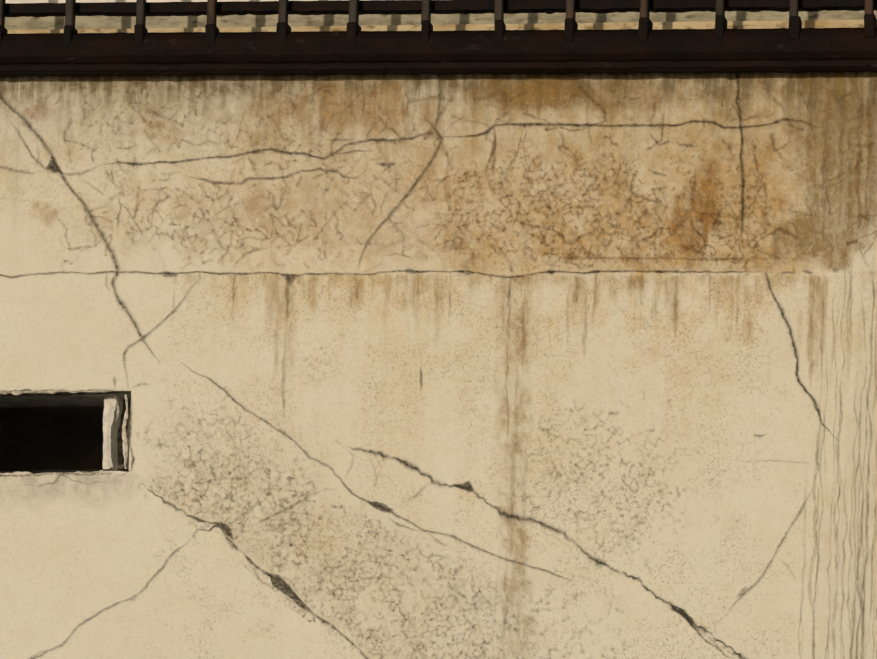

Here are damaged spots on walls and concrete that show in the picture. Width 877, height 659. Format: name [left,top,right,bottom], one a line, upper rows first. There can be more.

rust [491,76,576,108]
rust [529,72,875,267]
spalling [196,522,232,538]
crack [187,518,325,623]
spalling [263,574,314,621]
crack [625,574,743,659]